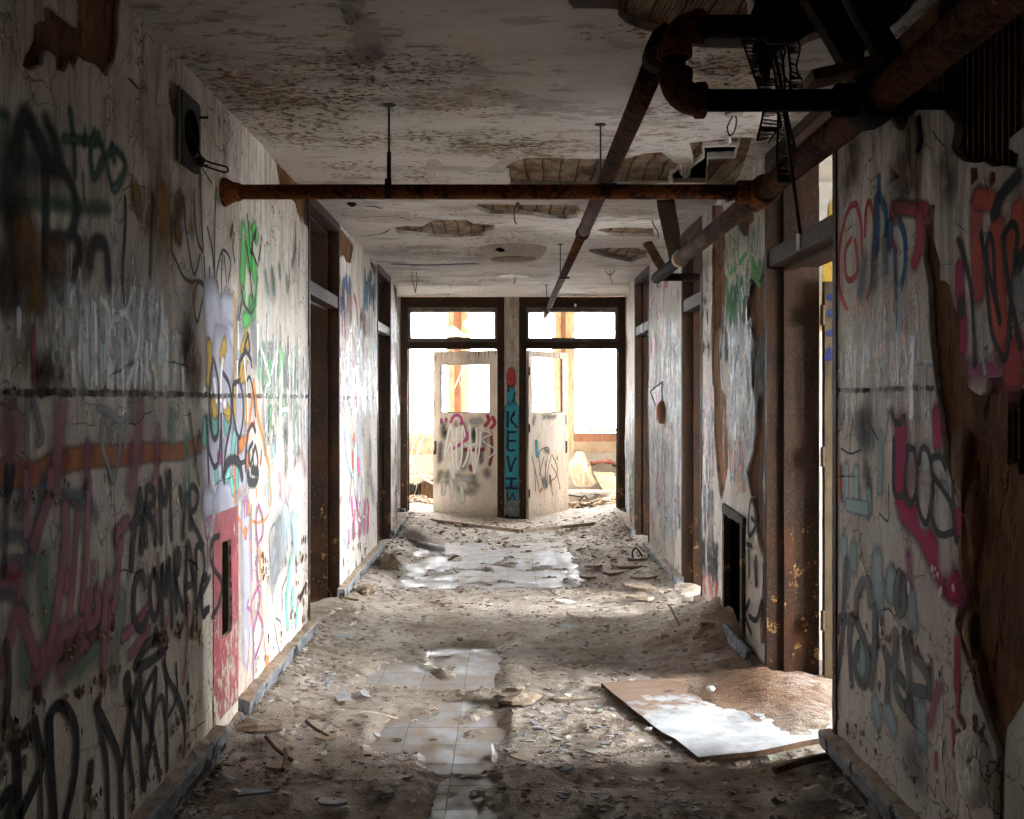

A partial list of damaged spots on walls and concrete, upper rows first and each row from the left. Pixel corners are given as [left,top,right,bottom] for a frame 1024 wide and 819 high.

spalling [22,0,120,77]
damp [179,49,575,184]
spalling [887,204,1024,819]